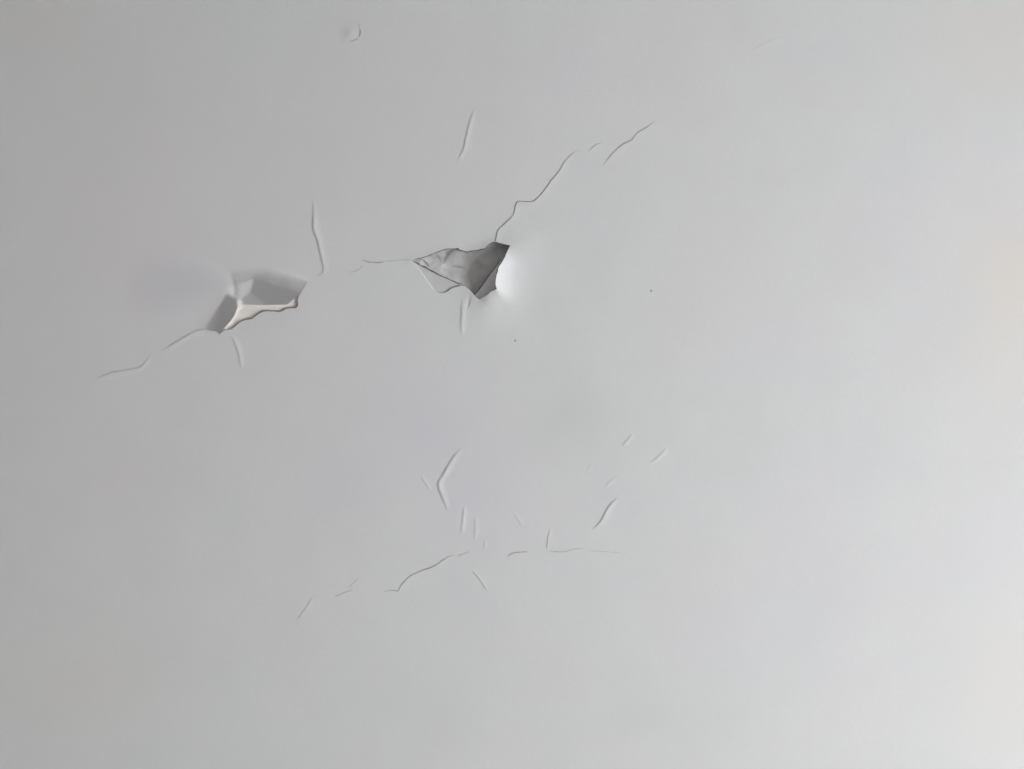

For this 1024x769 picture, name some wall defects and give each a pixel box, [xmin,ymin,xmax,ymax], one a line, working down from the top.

crack [457,109,477,162]
crack [494,121,655,243]
crack [308,200,330,279]
peeling [108,210,577,376]
crack [92,328,206,382]
crack [436,444,465,513]
crack [508,498,622,561]
crack [297,551,490,621]